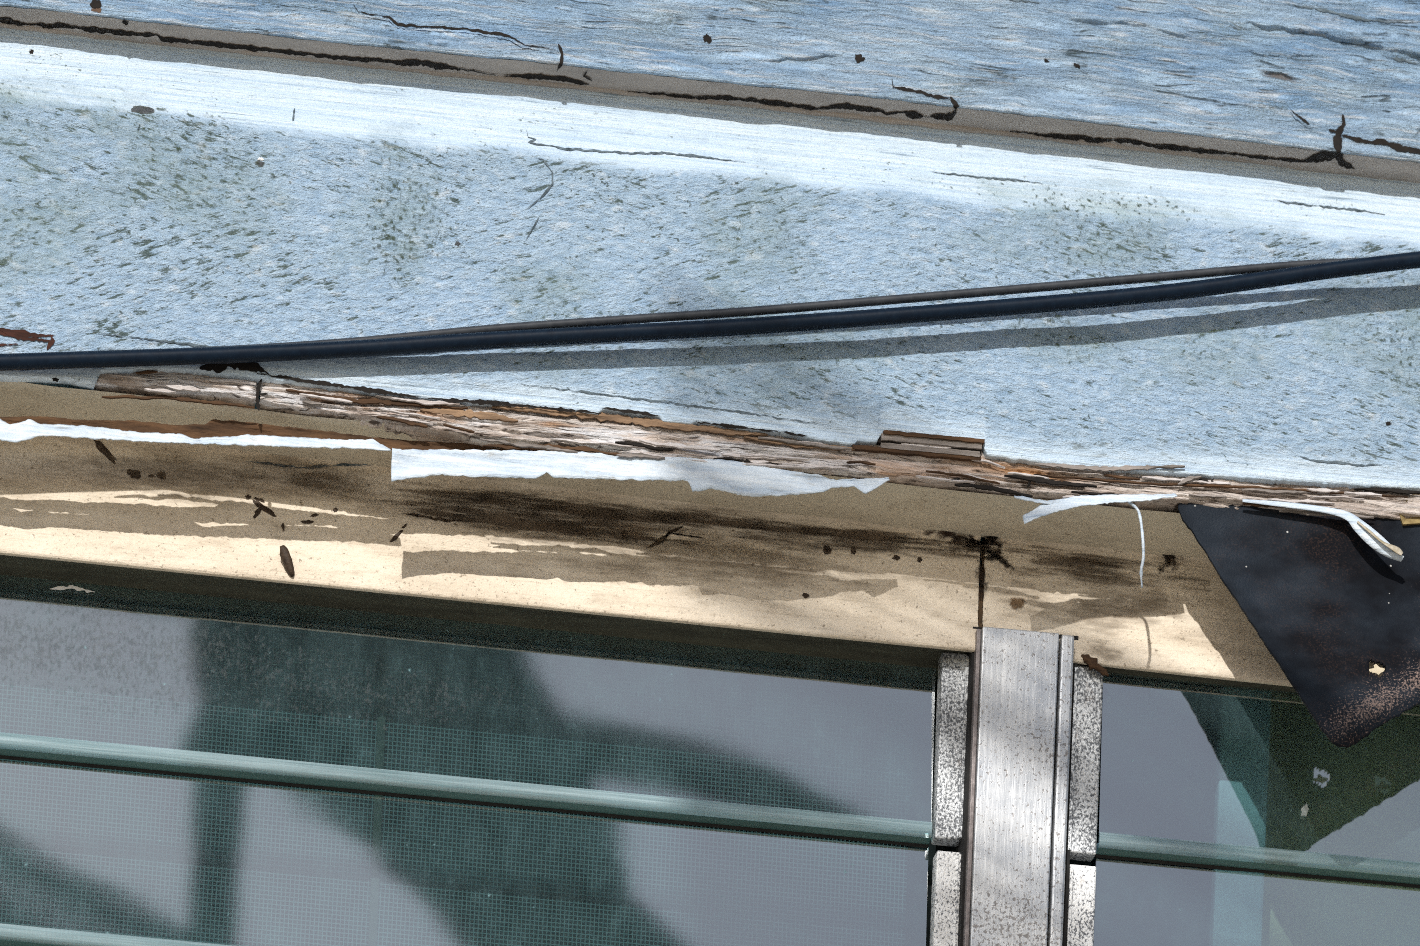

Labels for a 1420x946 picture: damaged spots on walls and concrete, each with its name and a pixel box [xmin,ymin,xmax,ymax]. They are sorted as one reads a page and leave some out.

crack [0,6,592,85]
crack [628,81,959,121]
peeling [0,416,889,497]
damp [398,489,1017,600]
peeling [1242,499,1404,562]
crack [977,550,985,627]